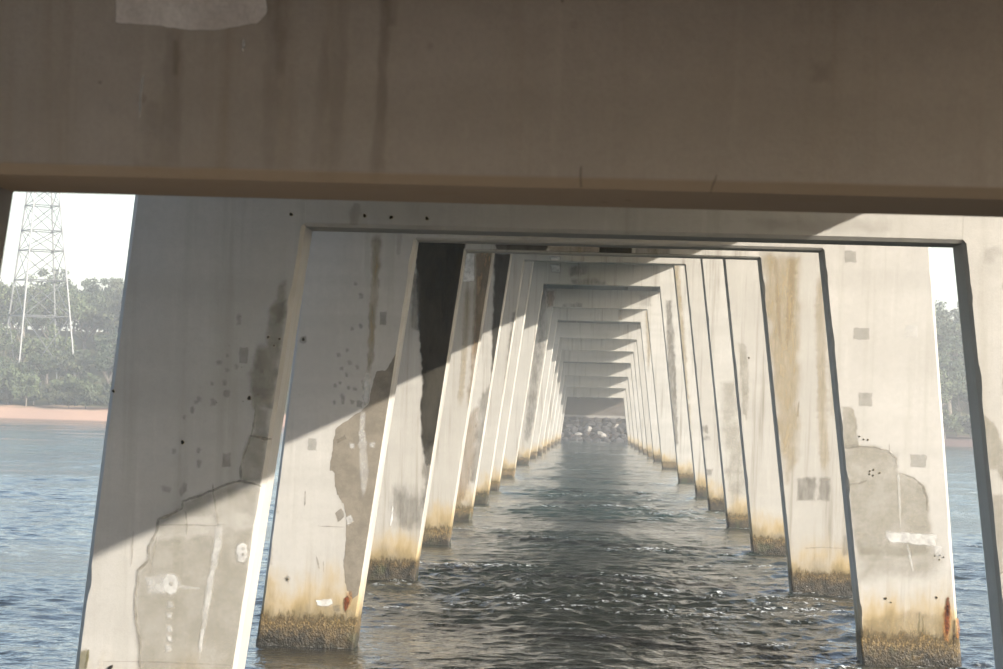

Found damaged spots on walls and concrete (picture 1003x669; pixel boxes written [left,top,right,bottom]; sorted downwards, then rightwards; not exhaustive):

peeling [330,354,396,598]
rust [944,597,960,643]